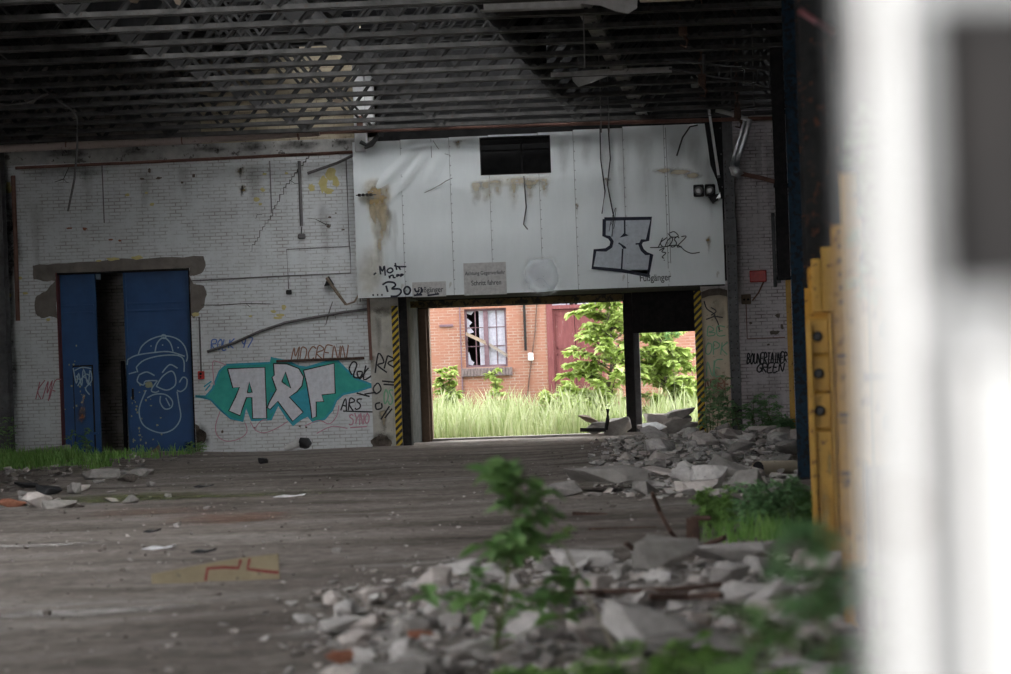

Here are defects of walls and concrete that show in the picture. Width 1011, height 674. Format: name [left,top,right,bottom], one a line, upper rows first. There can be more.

crack [252,156,309,245]
flaking render [19,255,207,321]